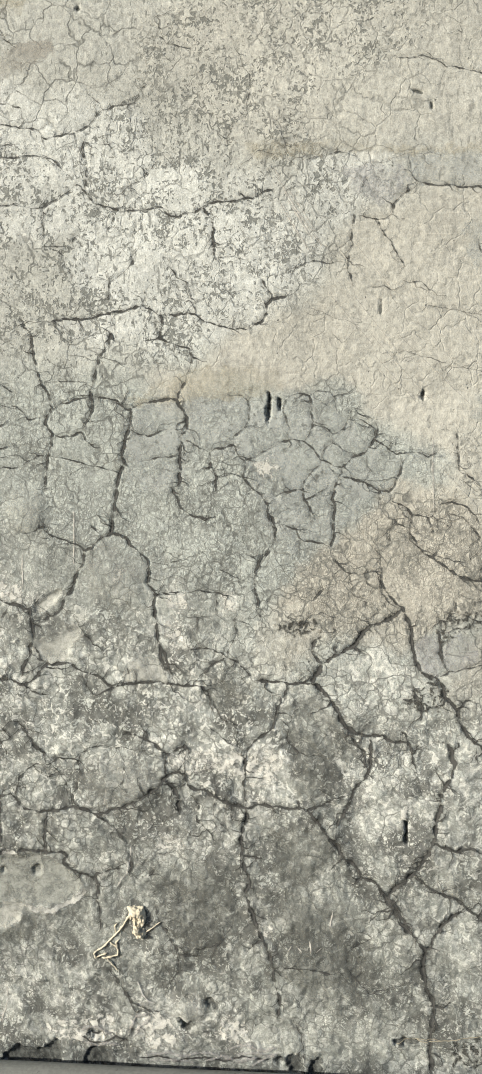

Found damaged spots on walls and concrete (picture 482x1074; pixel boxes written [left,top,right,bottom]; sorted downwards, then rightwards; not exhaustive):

crack [399,54,482,74]
crack [0,85,273,278]
crack [291,154,482,290]